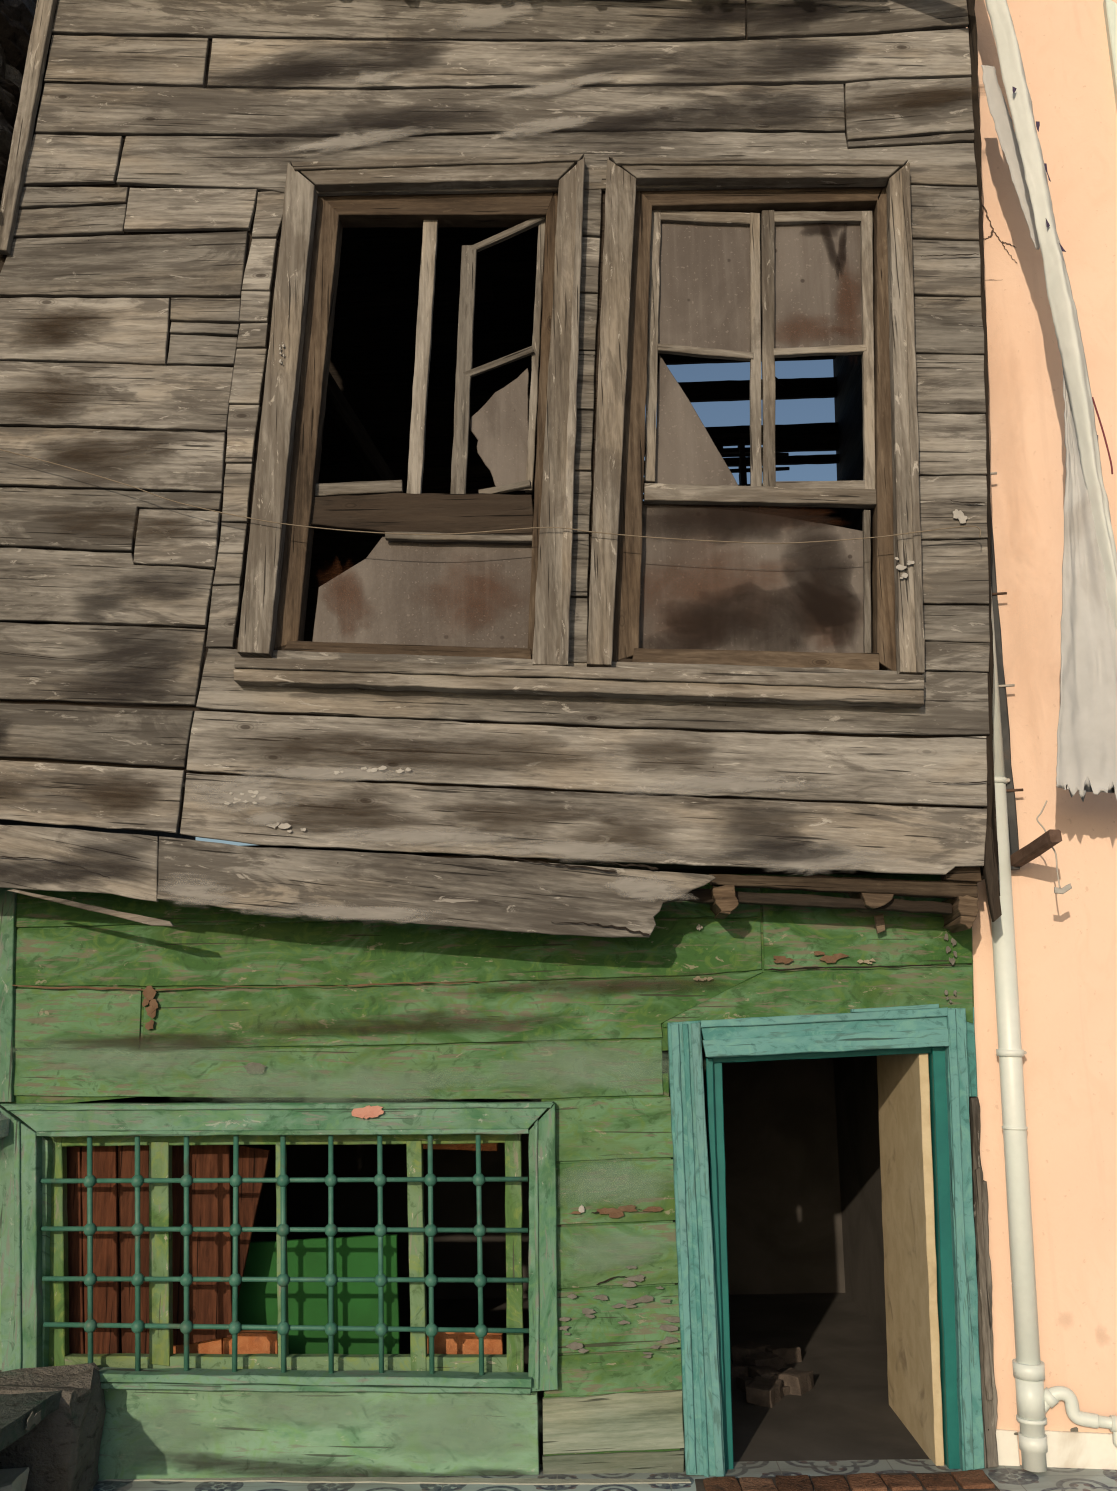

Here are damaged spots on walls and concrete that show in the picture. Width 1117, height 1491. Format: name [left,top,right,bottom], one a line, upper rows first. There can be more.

crack [921,205,1017,280]
crack [929,778,990,786]
peeling [570,1204,663,1218]
peeling [558,1265,680,1358]